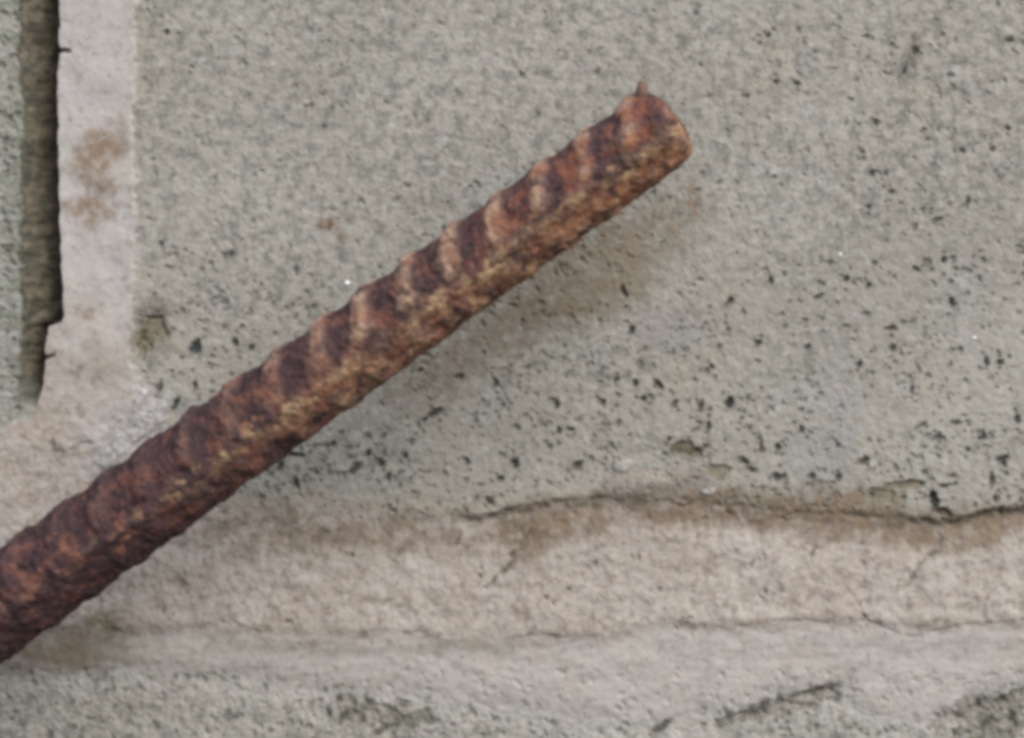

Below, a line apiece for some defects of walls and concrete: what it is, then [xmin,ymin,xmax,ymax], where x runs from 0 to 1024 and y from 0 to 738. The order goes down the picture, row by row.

rust [80,135,120,177]
damp [497,504,607,558]
damp [631,486,1024,550]